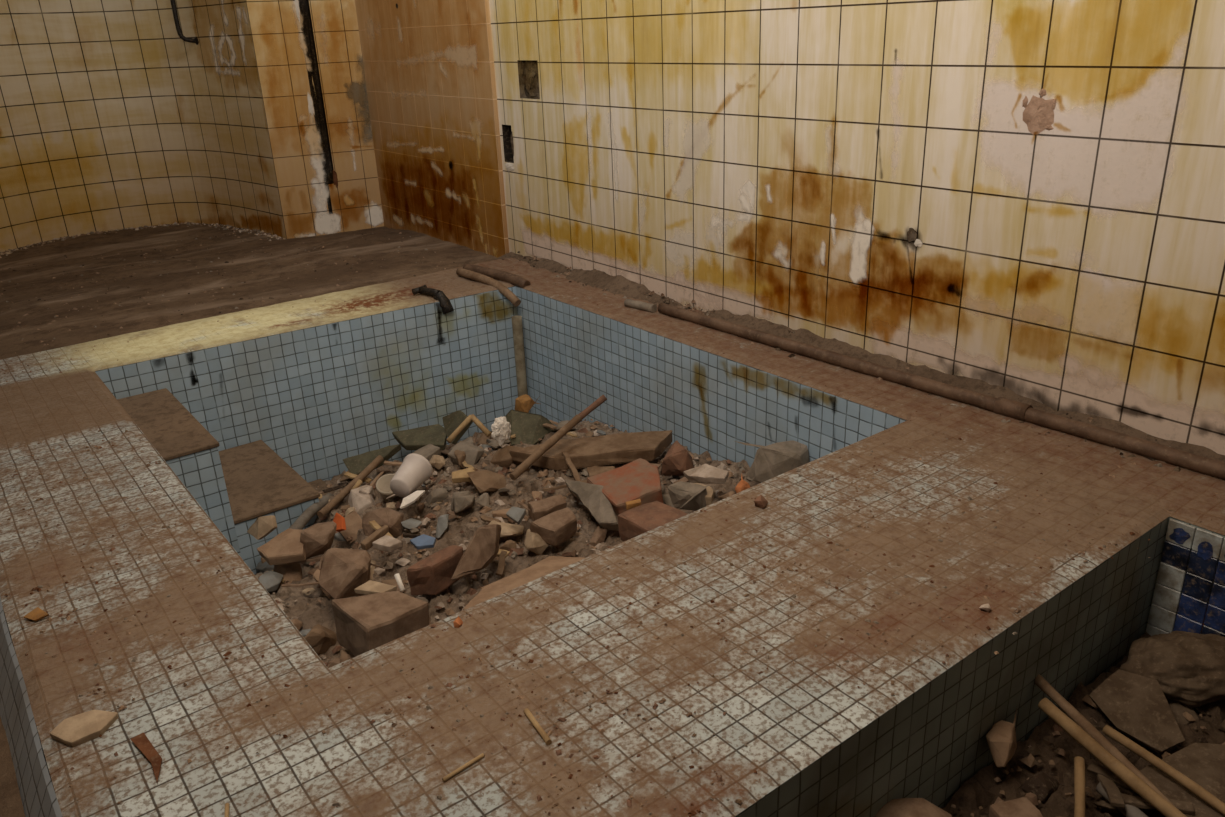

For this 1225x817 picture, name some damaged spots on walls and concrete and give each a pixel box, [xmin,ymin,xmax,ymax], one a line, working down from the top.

peeling [293,0,311,70]
peeling [345,58,371,170]
spalling [1022,89,1056,135]
peeling [295,92,432,237]
peeling [387,143,444,174]
peeling [446,179,496,254]